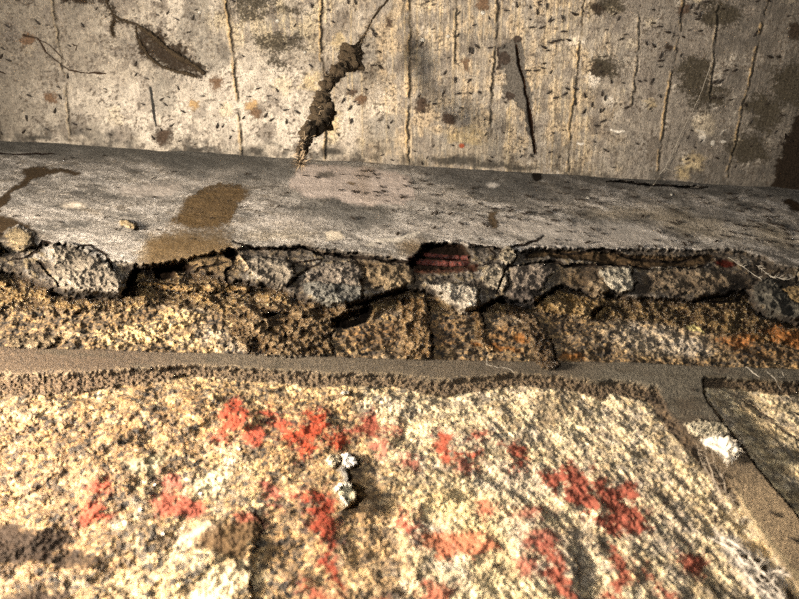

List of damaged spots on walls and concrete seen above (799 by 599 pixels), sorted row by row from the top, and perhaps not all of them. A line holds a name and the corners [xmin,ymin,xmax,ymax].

leakage [788,22,799,40]
crack [23,34,106,75]
crack [515,44,537,154]
leakage [722,60,799,190]
crack [0,150,55,158]
leakage [0,166,81,237]
leakage [122,184,176,196]
leakage [173,182,247,228]
leakage [784,199,799,212]
spalling [409,243,471,270]